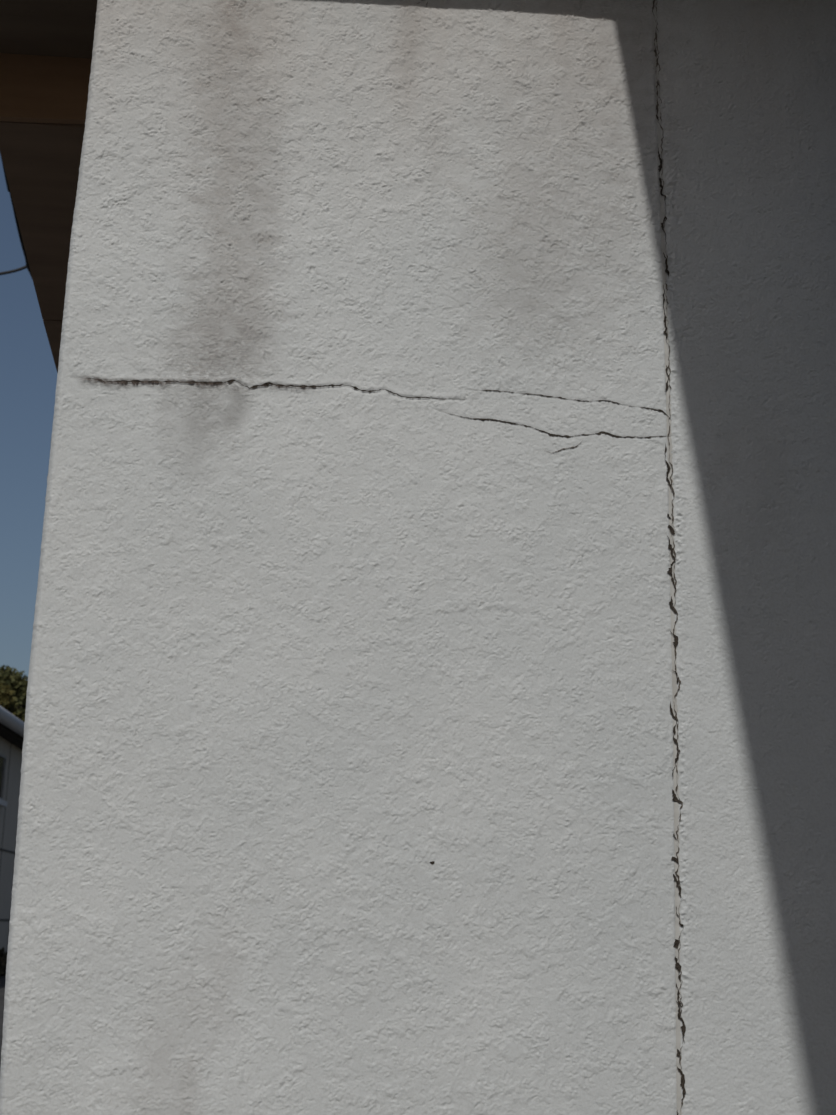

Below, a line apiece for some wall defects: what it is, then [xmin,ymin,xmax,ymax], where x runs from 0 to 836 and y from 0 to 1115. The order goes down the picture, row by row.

leakage [84,377,213,385]
crack [90,0,686,1115]